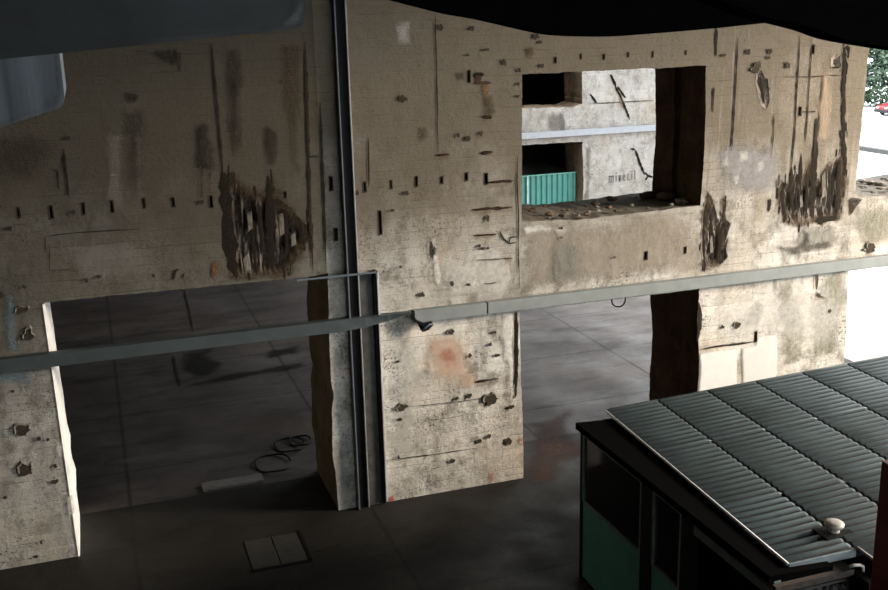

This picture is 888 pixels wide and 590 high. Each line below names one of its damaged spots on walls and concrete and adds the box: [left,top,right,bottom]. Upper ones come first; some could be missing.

spalling [723,44,862,232]
spalling [219,165,310,281]
spalling [699,190,731,272]